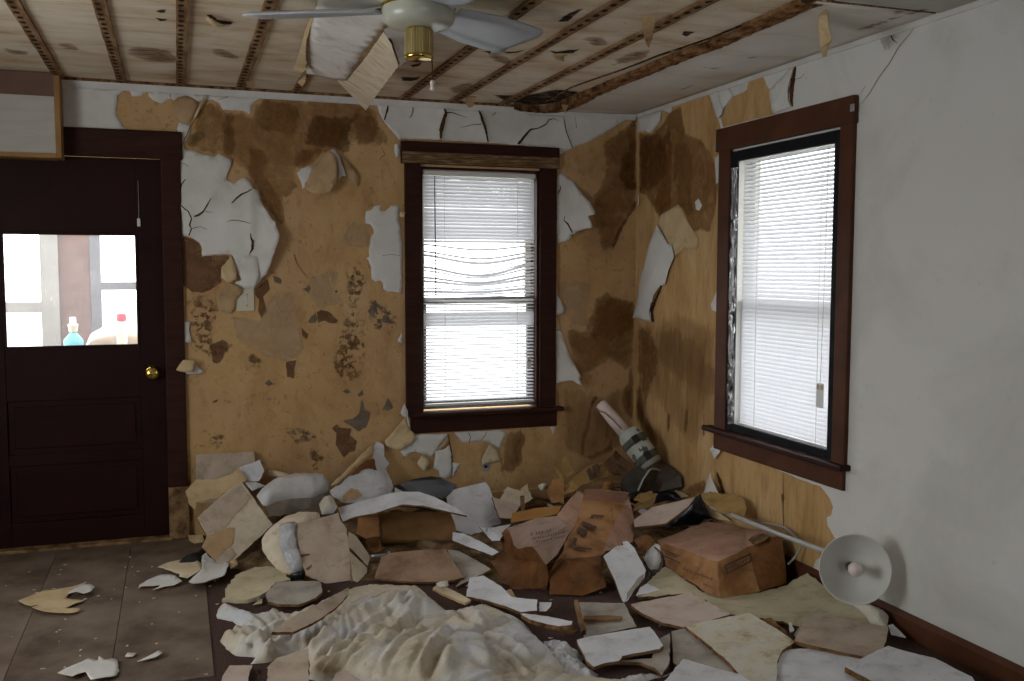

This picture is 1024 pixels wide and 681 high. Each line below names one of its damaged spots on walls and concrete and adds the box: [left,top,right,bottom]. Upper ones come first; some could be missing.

crack [860,28,914,104]
peeling [62,87,282,318]
crack [179,96,254,255]
damp [194,99,382,218]
peeling [297,150,359,194]
peeling [365,204,405,293]
crack [439,108,496,142]
crack [518,116,577,148]
damp [595,108,717,245]
mould [192,298,228,364]
mould [335,270,364,377]
peeling [377,67,835,568]